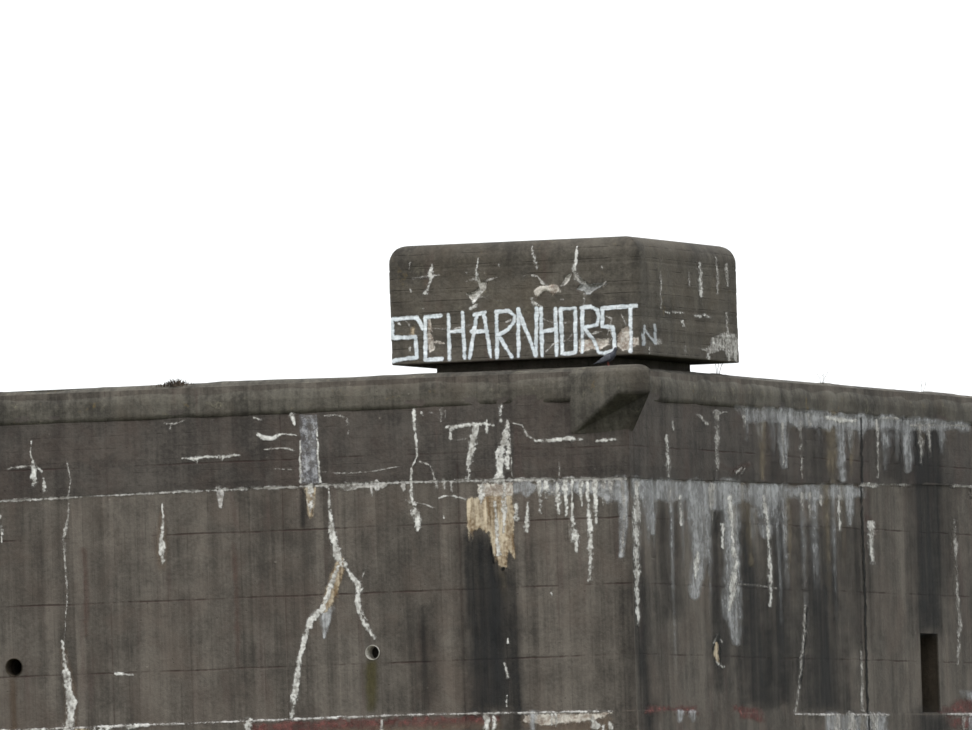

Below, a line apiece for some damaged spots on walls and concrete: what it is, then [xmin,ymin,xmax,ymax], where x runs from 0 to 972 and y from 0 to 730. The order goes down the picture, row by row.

crack [290,405,616,719]
peeling [467,482,515,571]
leakage [465,538,613,730]
leakage [513,408,968,730]